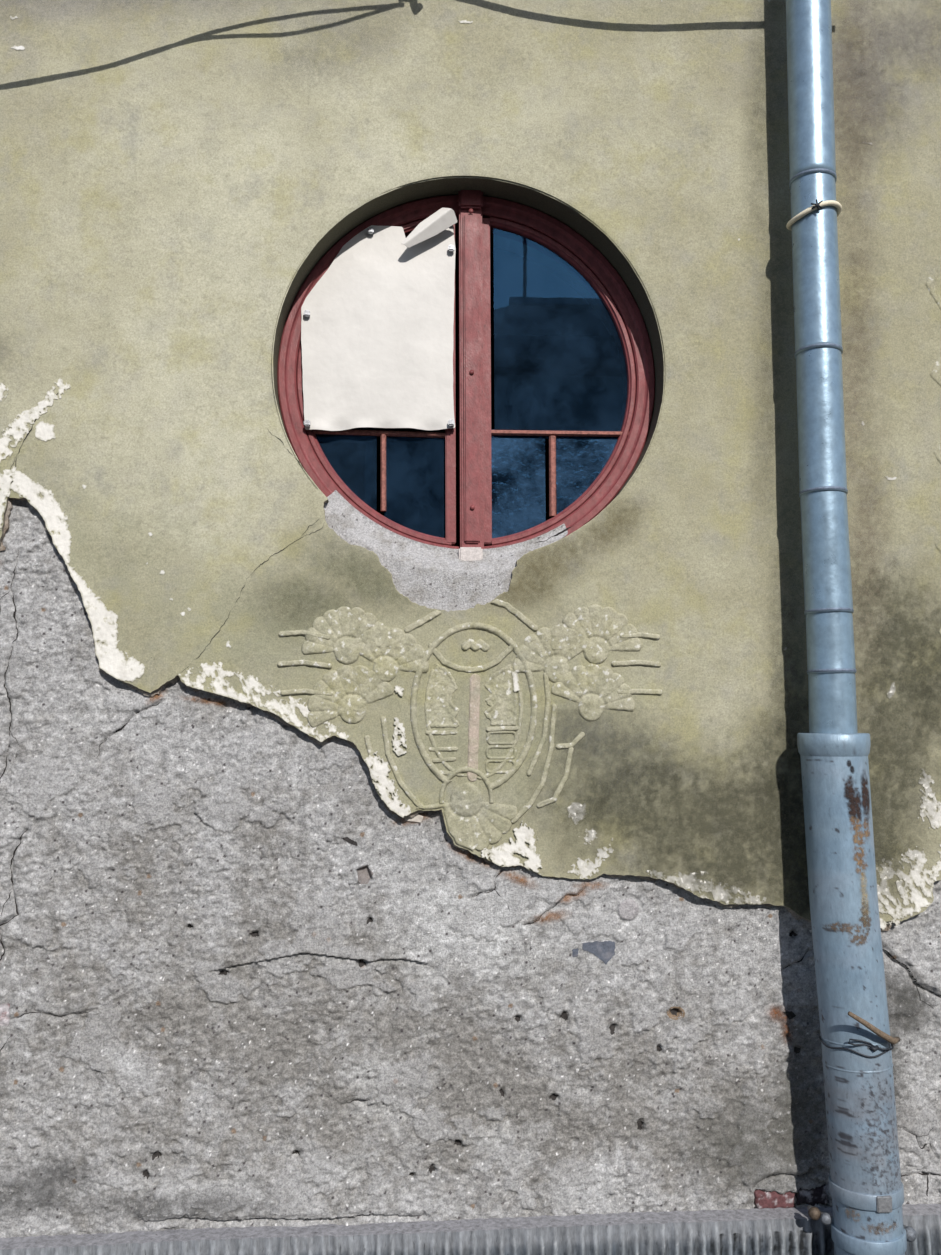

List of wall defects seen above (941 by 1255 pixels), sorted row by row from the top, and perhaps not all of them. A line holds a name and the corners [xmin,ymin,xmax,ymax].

crack [0,552,19,779]
crack [97,510,335,757]
flaking render [0,379,832,1238]
water stain [571,741,810,916]
peeling [917,768,941,829]
crack [0,830,27,961]
crack [472,869,585,925]
crack [0,1011,90,1051]
flaking render [876,844,941,1205]
crack [882,949,941,1009]
crack [901,1128,941,1196]